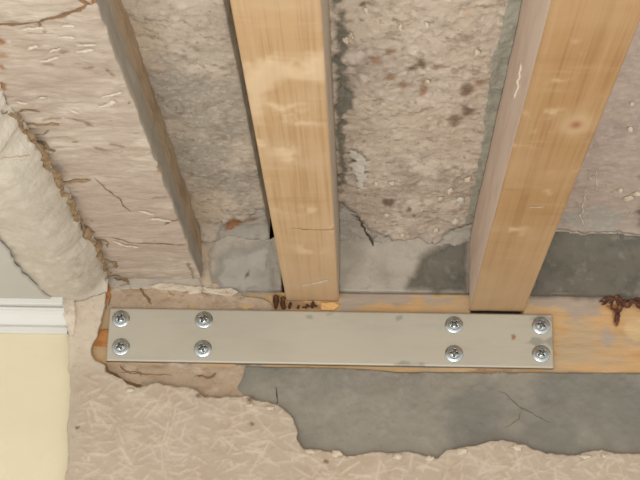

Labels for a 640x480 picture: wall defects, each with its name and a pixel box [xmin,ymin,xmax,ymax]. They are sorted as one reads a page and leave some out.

crack [351,214,374,246]
leakage [408,241,467,293]